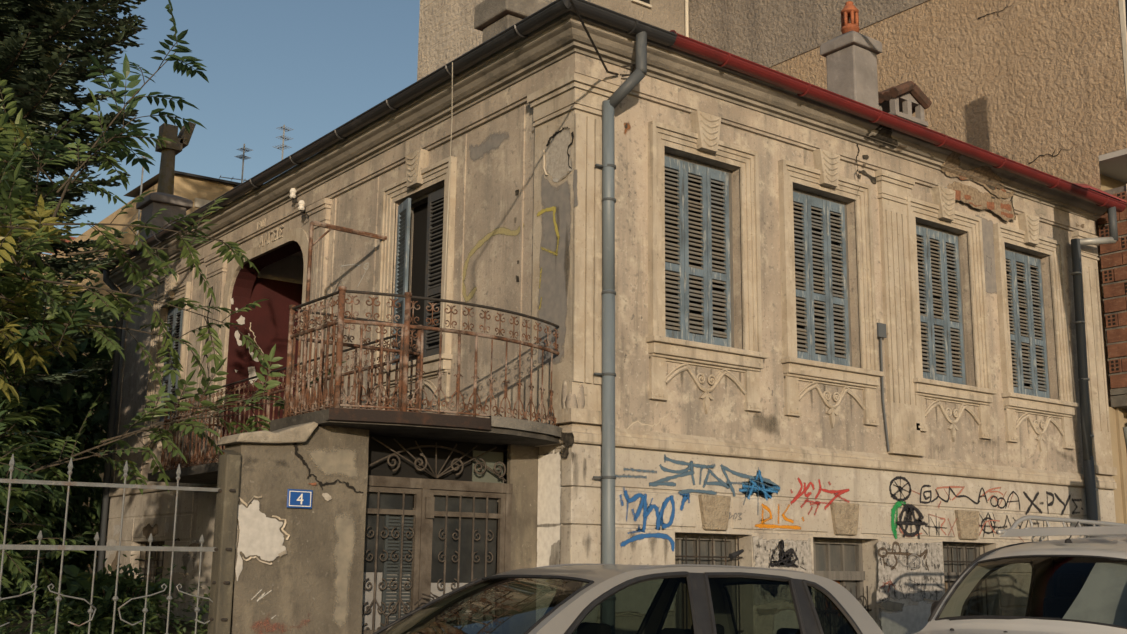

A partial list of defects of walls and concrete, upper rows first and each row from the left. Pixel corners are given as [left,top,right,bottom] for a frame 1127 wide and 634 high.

spalling [941,151,1016,293]
peeling [230,298,259,385]
crack [293,443,363,493]
peeling [235,496,290,581]